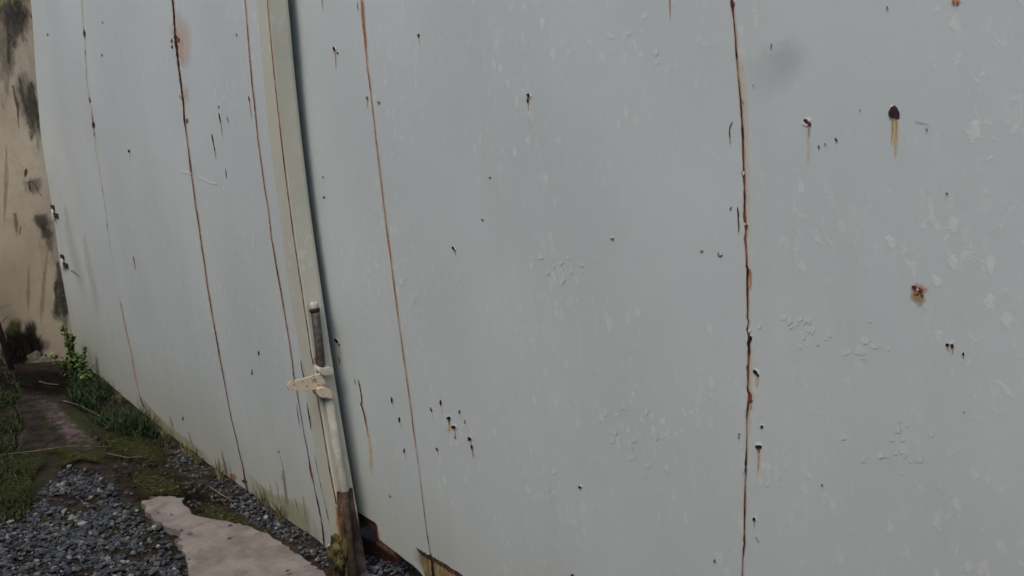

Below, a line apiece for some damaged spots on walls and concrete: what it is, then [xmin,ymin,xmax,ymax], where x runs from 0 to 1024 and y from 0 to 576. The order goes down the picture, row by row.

water stain [0,0,27,47]
water stain [12,78,40,141]
water stain [35,215,52,238]
water stain [53,262,68,317]
corrosion [912,285,924,303]
corrosion [336,488,367,576]
corrosion [417,548,463,576]